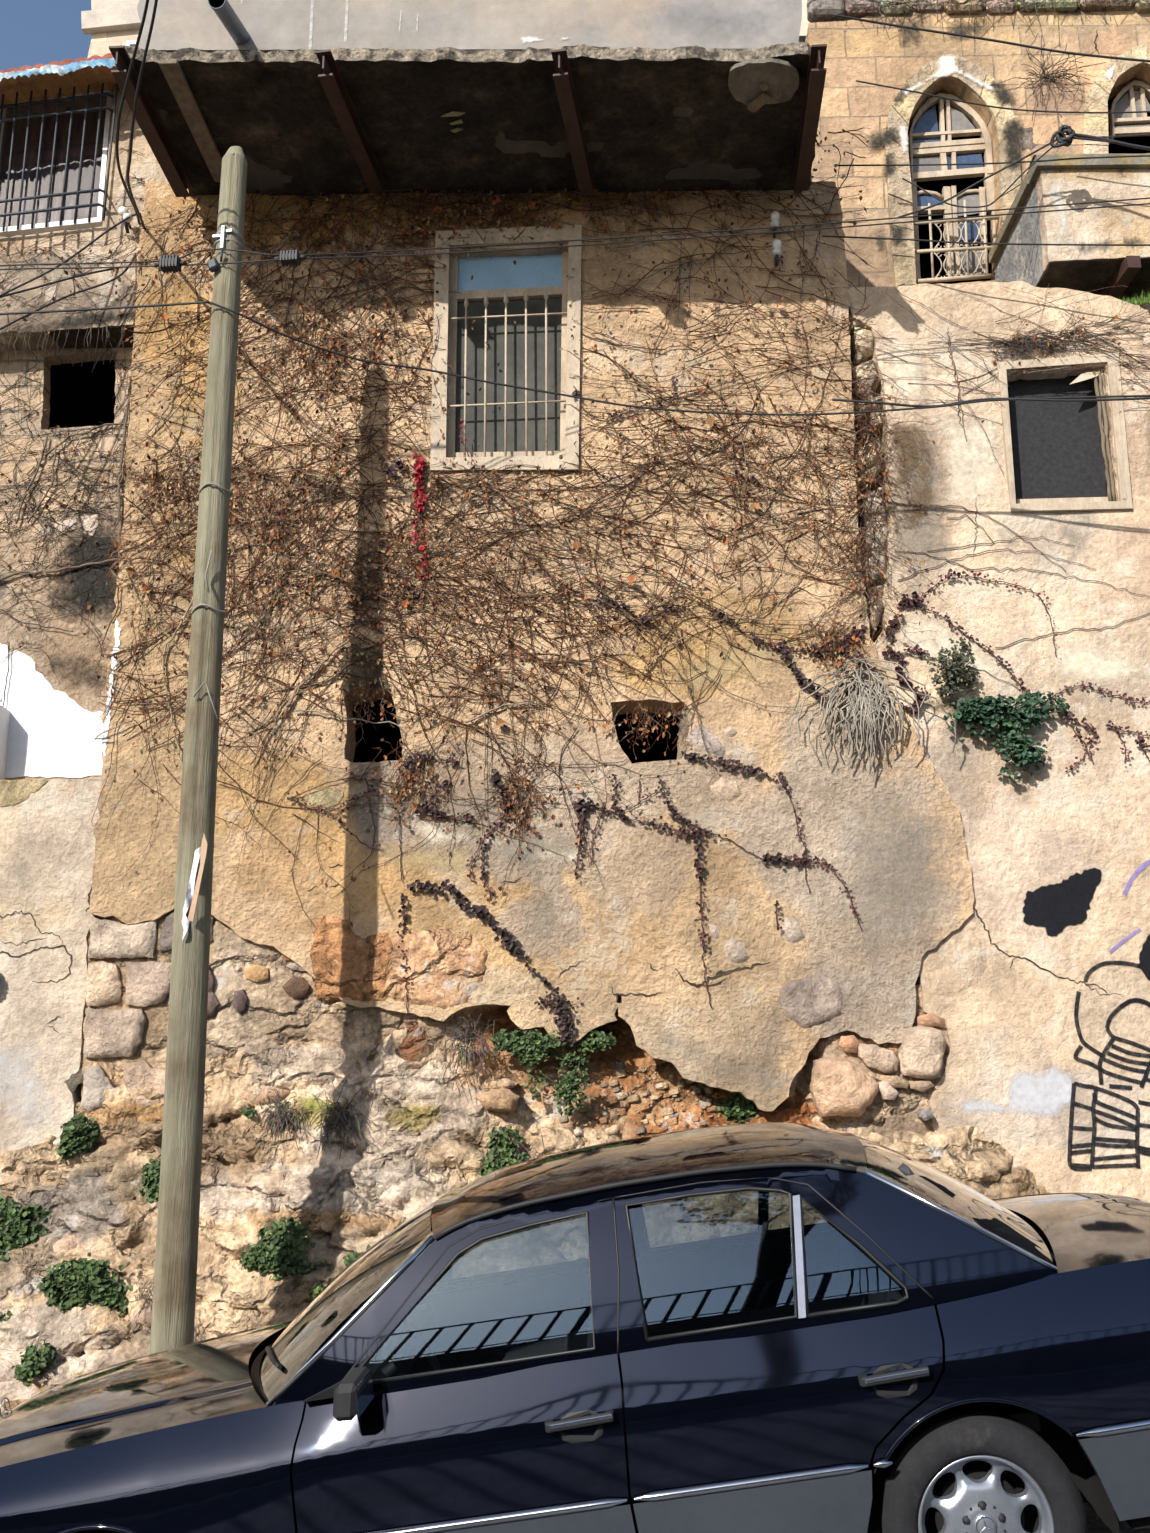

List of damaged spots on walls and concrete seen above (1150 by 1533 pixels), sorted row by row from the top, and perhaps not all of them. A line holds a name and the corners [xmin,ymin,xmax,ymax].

peeling [54,514,99,536]
peeling [0,643,104,806]
crack [0,910,72,1033]
flaking render [64,1069,84,1093]